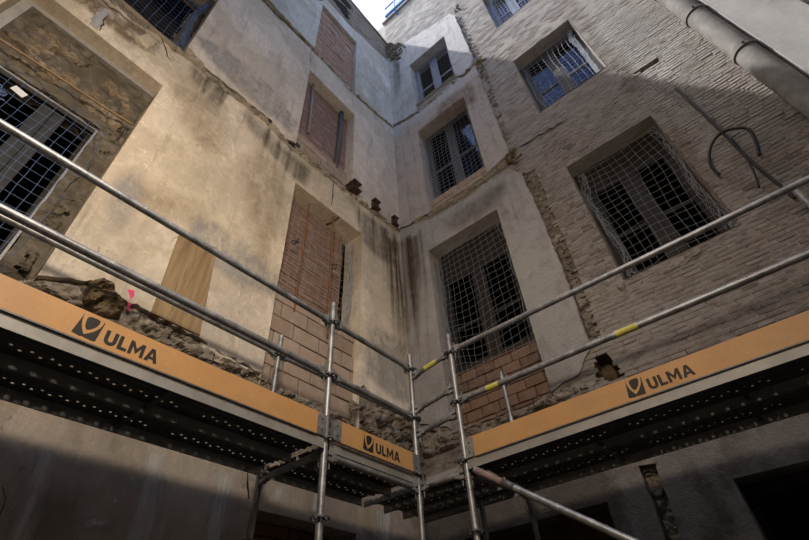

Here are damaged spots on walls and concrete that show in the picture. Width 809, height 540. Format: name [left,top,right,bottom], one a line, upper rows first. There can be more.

crack [193,55,272,122]
spalling [262,0,515,152]
spalling [357,162,507,231]
spalling [525,171,601,340]
spalling [642,467,682,540]